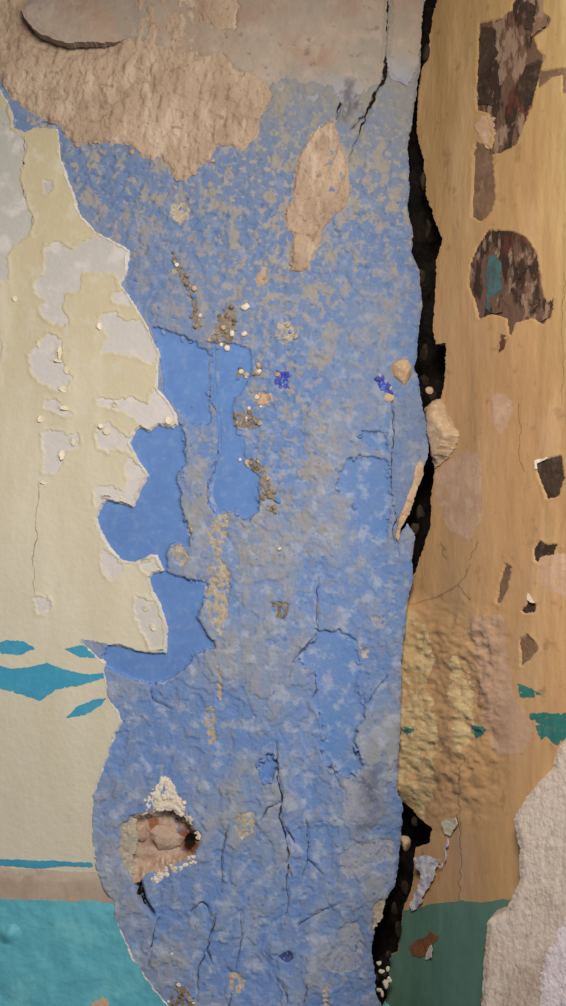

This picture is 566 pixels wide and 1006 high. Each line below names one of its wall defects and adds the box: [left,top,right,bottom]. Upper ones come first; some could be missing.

crack [336,57,388,156]
peeling [473,0,566,221]
crack [392,0,446,574]
peeling [469,230,553,351]
flaking render [0,0,428,1006]
peeling [534,455,565,499]
crack [190,829,243,996]
crack [260,744,339,926]
crack [371,802,431,1005]
peeling [409,931,438,960]
flaking render [481,739,566,1006]